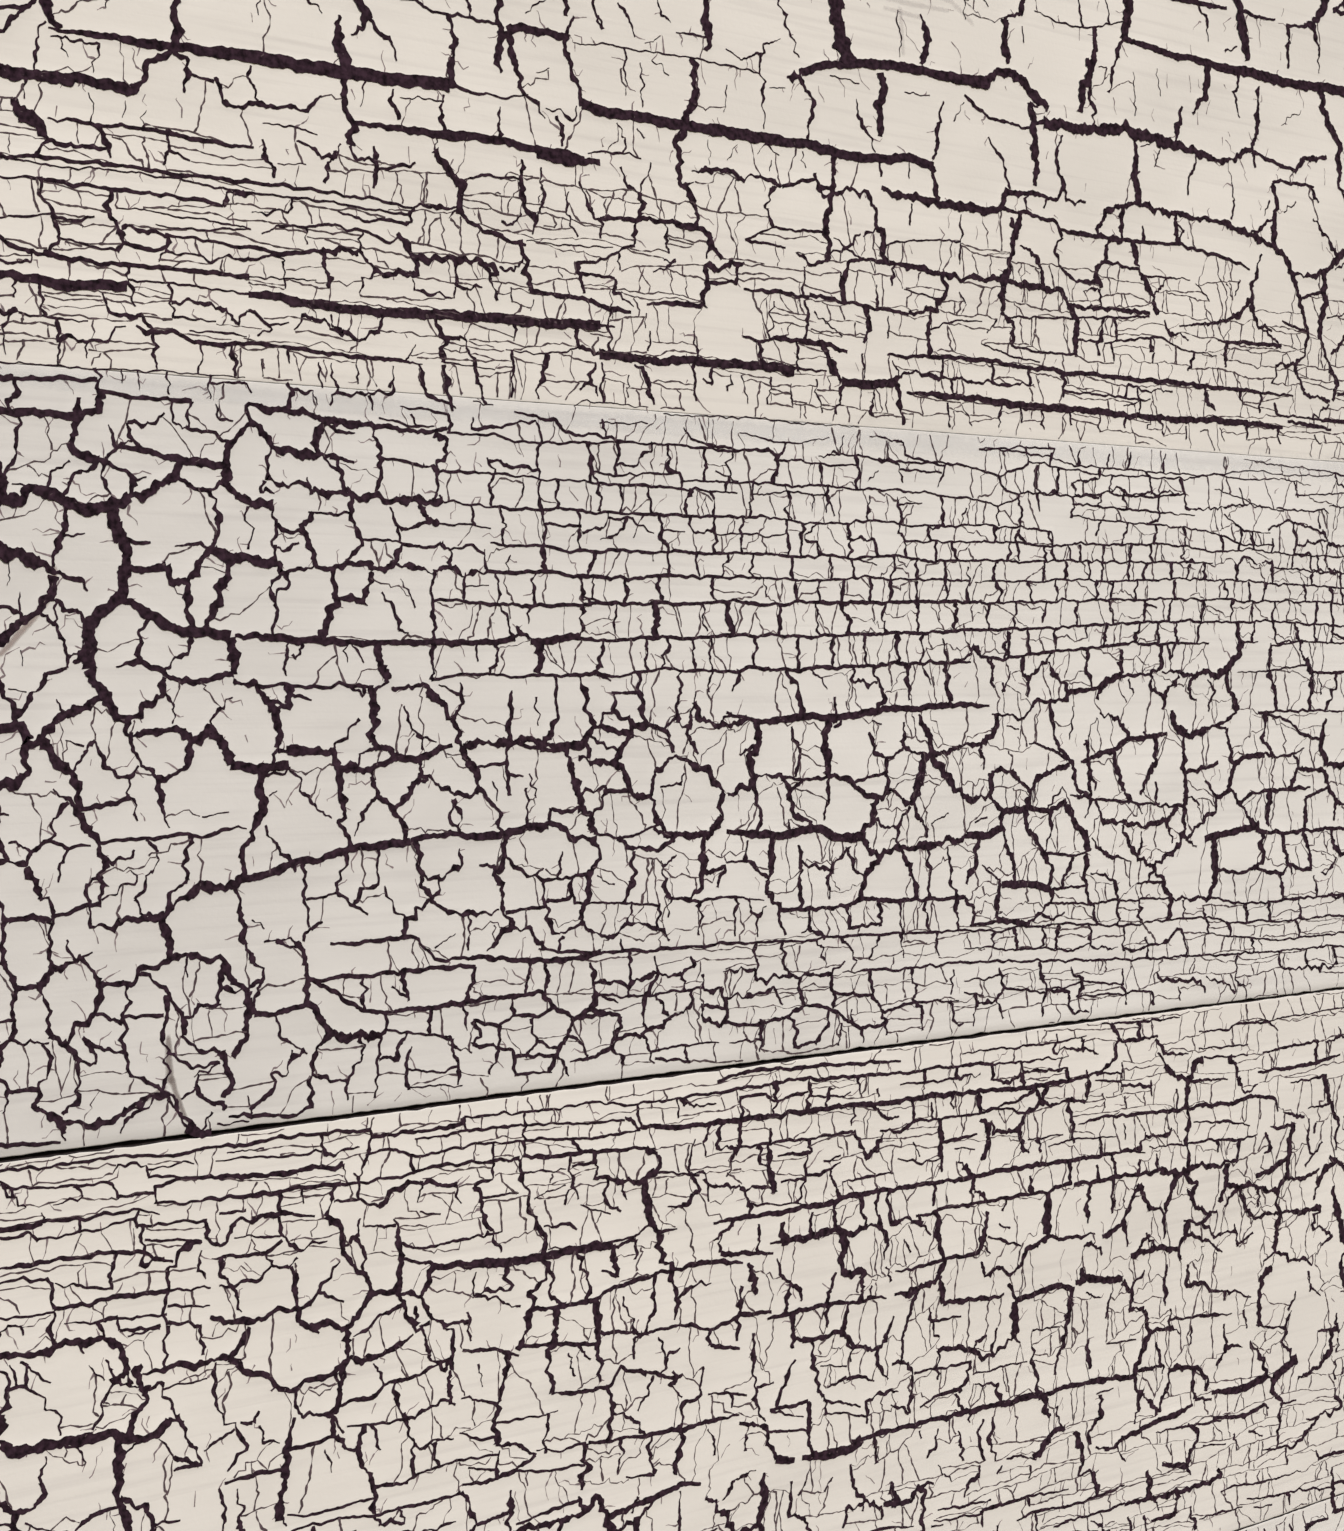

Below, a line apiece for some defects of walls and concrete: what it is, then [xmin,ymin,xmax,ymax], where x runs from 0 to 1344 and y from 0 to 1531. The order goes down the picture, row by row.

crack [251,0,276,20]
crack [591,0,604,30]
crack [617,2,645,40]
crack [655,0,671,22]
crack [777,0,800,57]
crack [896,10,908,52]
crack [1234,0,1276,61]
crack [1279,0,1344,70]
crack [640,63,648,107]
crack [388,89,401,120]
crack [422,1518,456,1531]
crack [1276,1514,1294,1531]